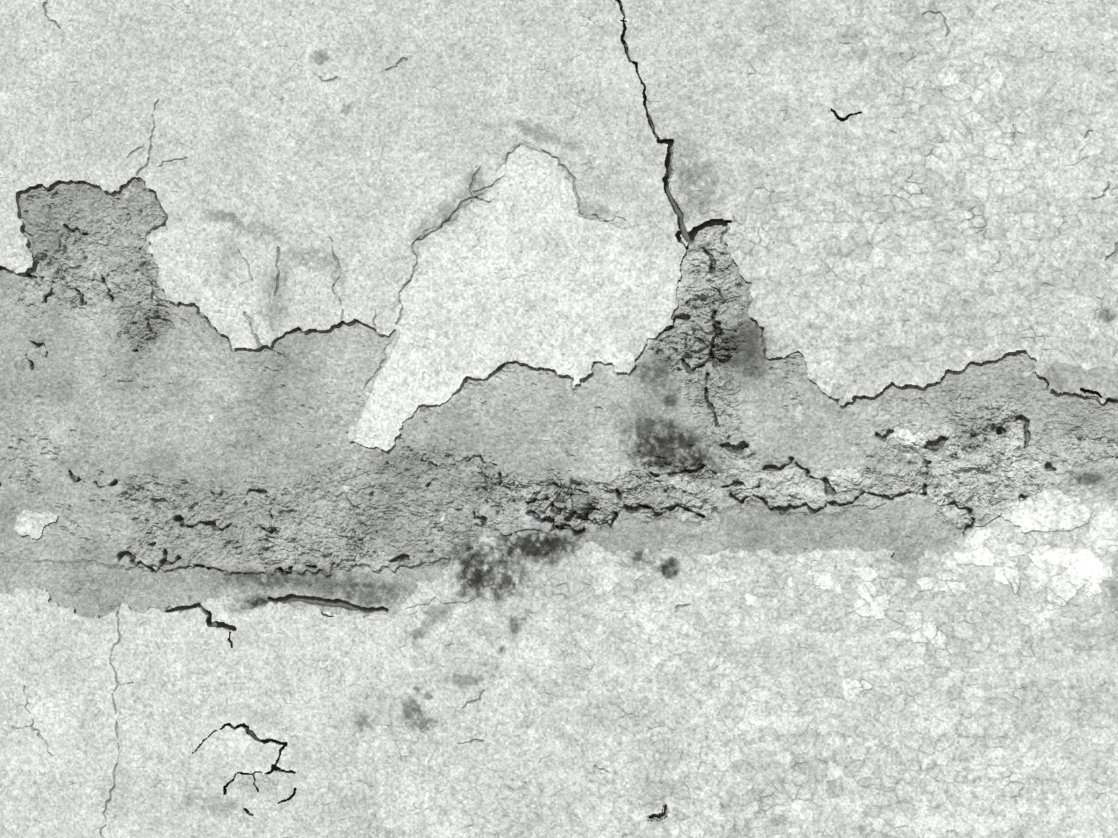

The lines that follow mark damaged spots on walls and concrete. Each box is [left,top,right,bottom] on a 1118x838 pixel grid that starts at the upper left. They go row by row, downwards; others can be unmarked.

crack [615,0,732,250]
peeling [0,143,1118,625]
crack [165,602,237,647]
crack [267,594,389,617]
peeling [907,619,937,645]
crack [99,603,134,838]
crack [193,723,297,816]
crack [646,804,668,820]